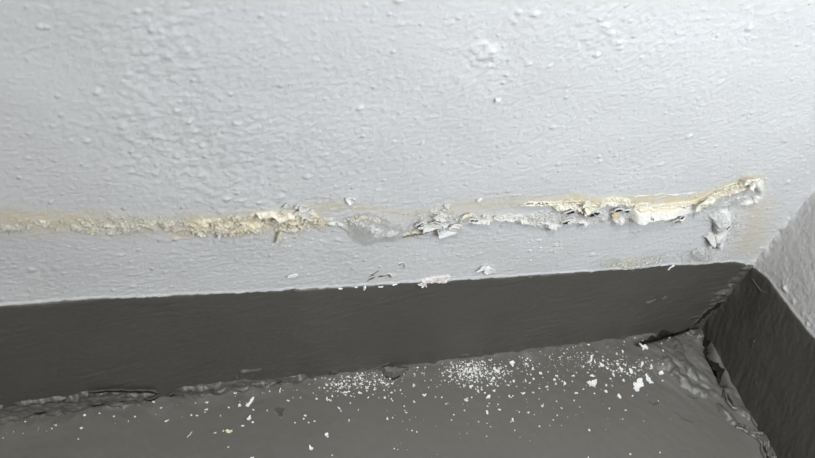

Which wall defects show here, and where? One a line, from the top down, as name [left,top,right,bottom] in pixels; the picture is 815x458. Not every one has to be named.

peeling [184,203,331,244]
damp [0,169,787,265]
peeling [404,204,468,240]
peeling [521,178,772,226]
damp [589,250,669,272]